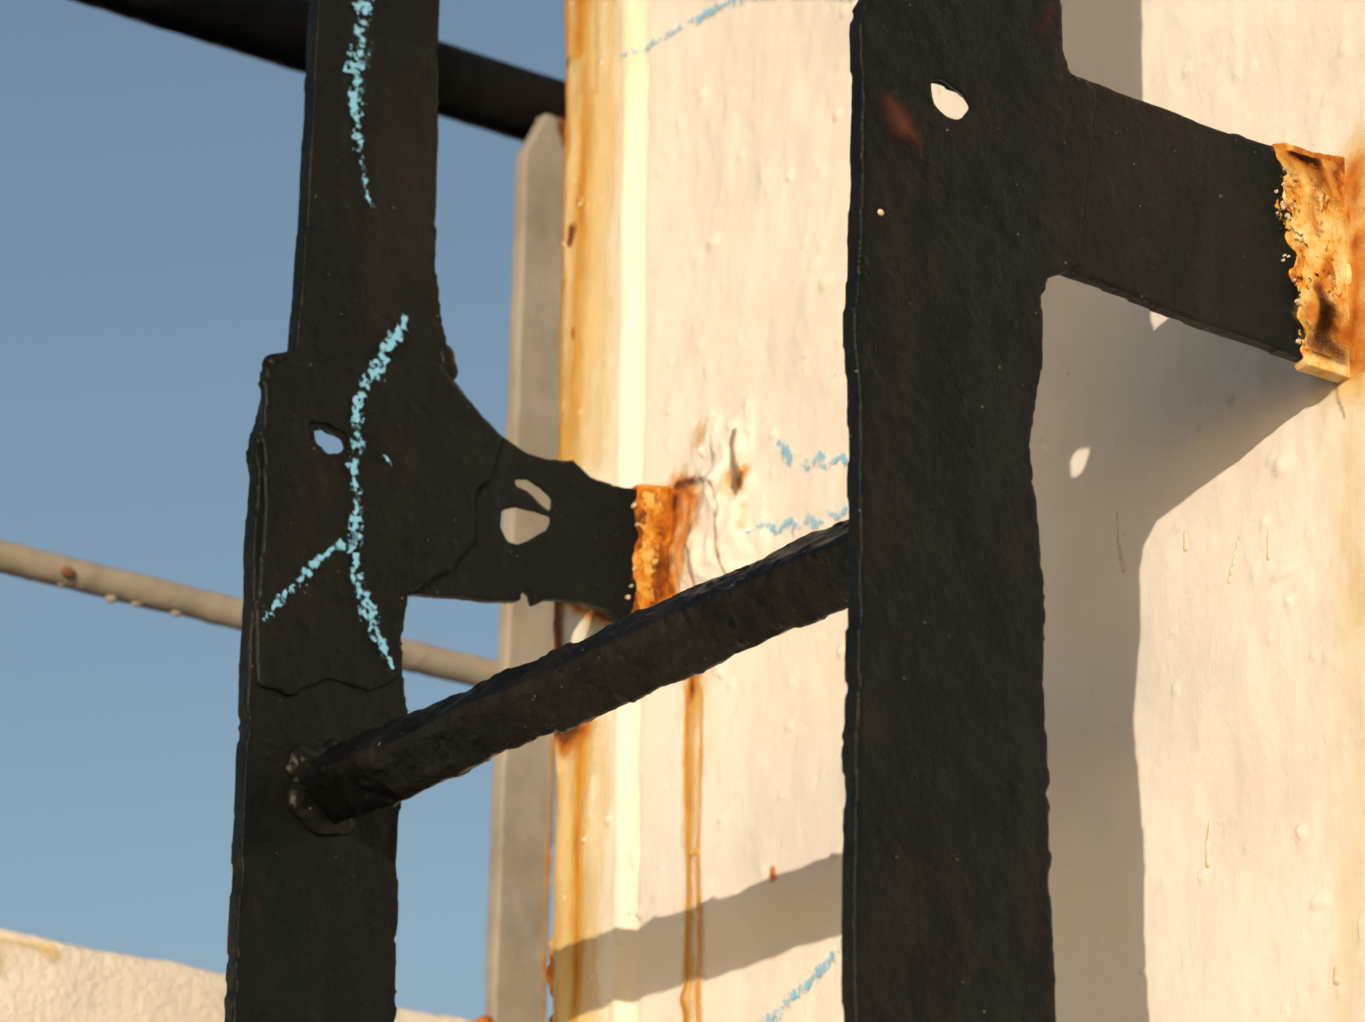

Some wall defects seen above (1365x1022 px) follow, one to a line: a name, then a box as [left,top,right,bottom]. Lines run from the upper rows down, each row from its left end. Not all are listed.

corrosion [557,0,597,461]
corrosion [1270,142,1365,383]
corrosion [553,601,615,649]
corrosion [625,474,698,613]
corrosion [726,428,747,495]
corrosion [542,722,592,1022]
corrosion [680,675,702,1022]